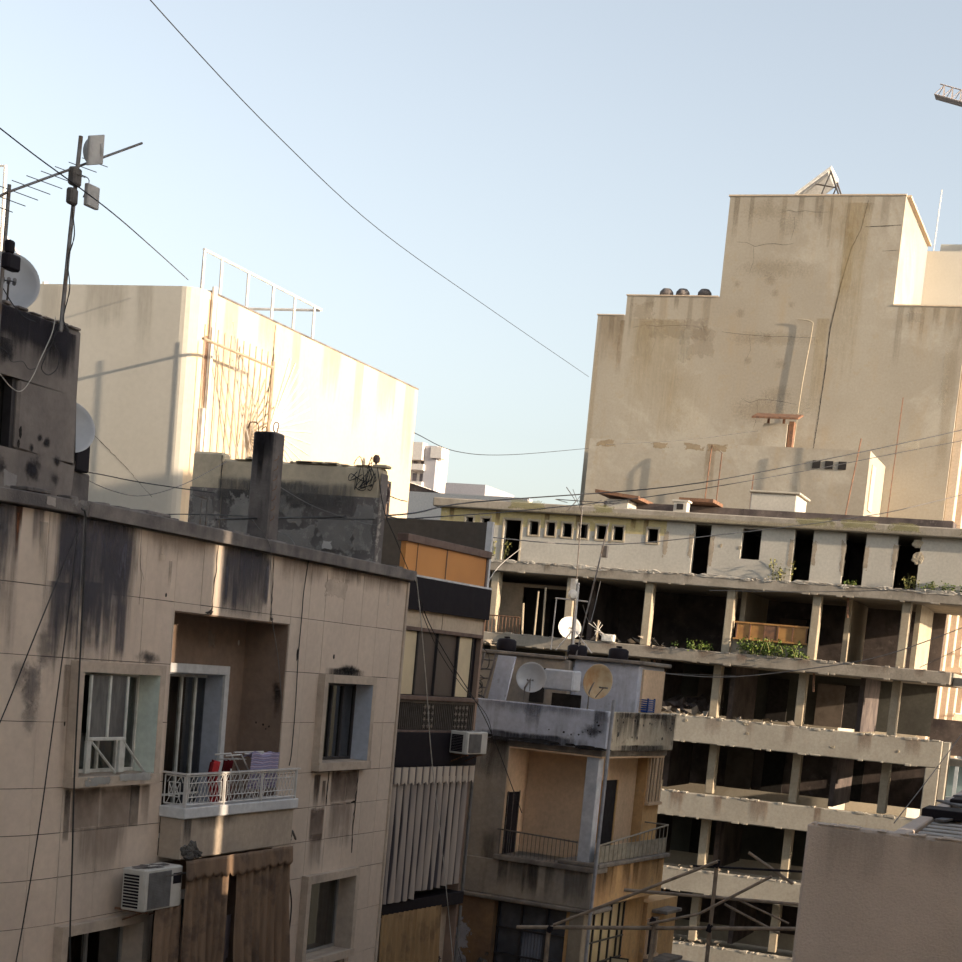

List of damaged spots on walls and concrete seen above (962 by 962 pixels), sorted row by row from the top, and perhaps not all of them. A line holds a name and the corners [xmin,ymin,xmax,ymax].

water stain [0,304,76,365]
crack [747,201,895,448]
mould [26,435,49,478]
peeling [226,491,249,533]
water stain [34,496,140,651]
water stain [224,547,270,606]